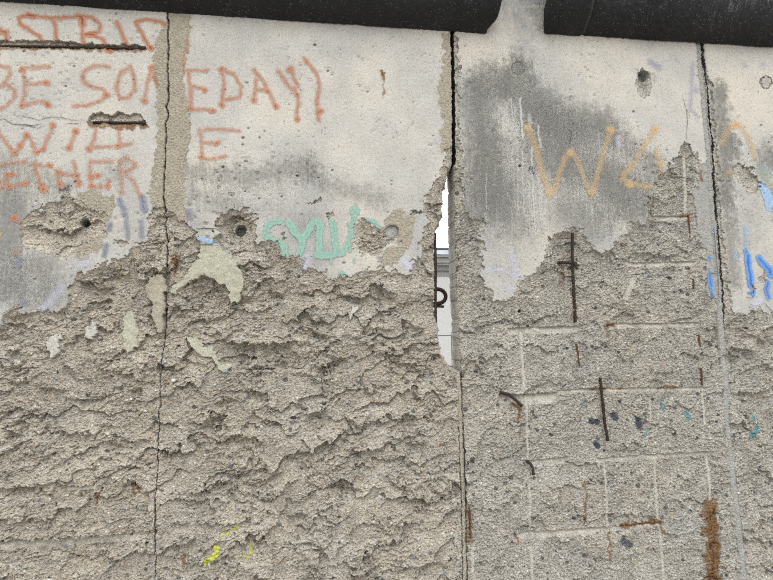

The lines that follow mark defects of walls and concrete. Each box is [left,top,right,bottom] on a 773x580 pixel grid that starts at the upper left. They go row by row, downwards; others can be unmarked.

crack [154,296,168,580]
spalling [0,146,463,580]
leakage [459,48,660,237]
spalling [453,33,742,580]
rust [700,498,722,580]
spalling [706,70,773,580]